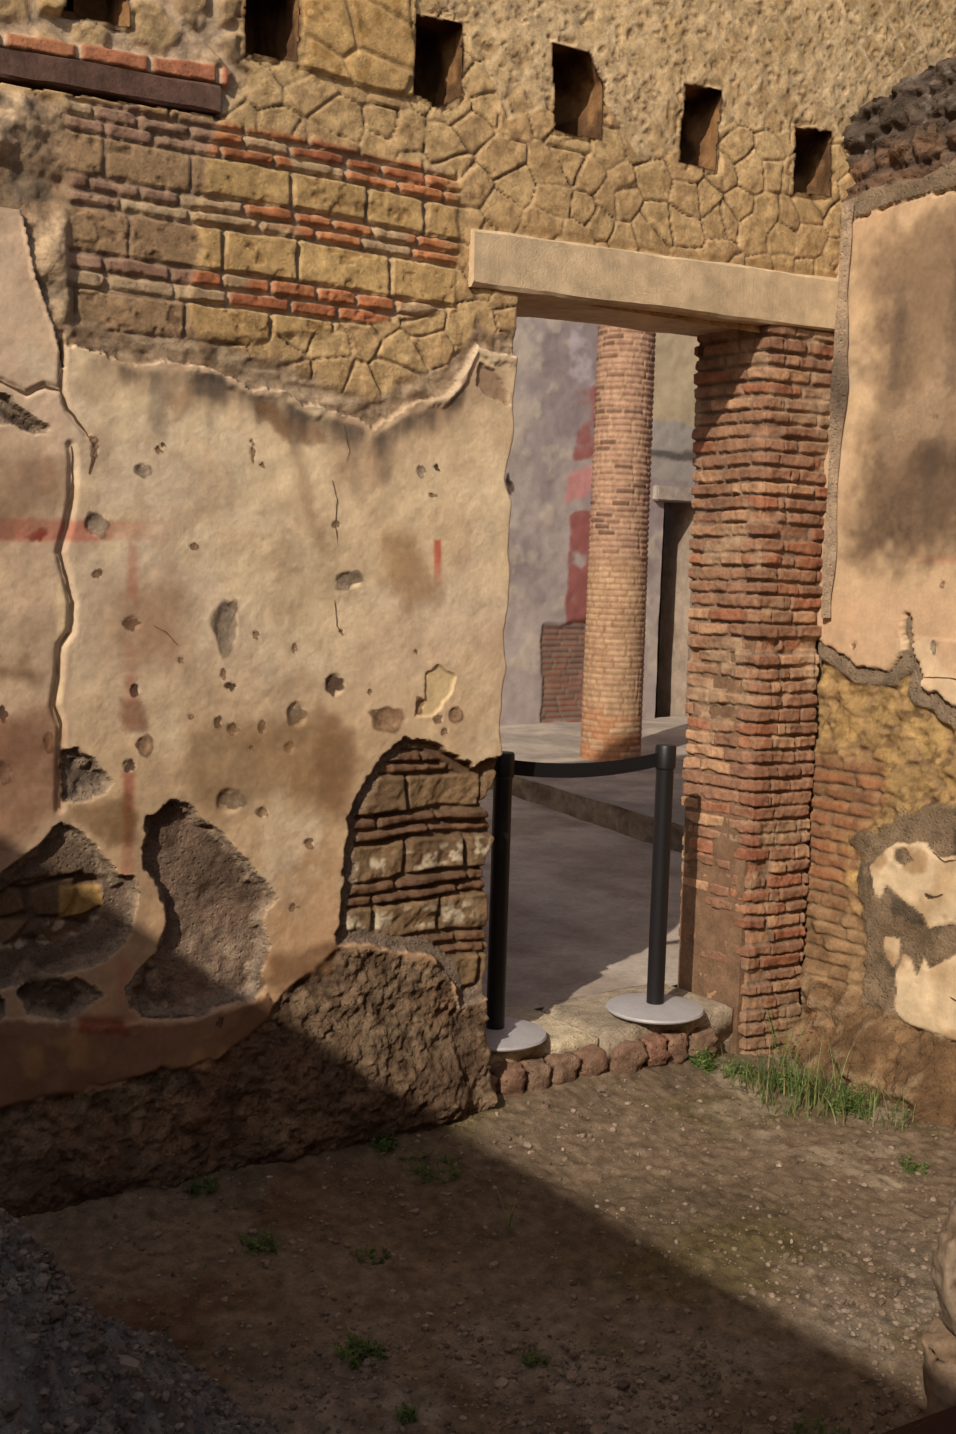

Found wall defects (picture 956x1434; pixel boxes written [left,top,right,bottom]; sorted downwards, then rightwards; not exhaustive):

spalling [0,392,50,435]
peeling [476,361,511,405]
crack [0,335,95,808]
spalling [211,600,237,691]
spalling [818,612,956,727]
spalling [61,734,152,803]
spalling [219,789,268,817]
spalling [335,664,499,1007]
spalling [0,798,299,1028]
peeling [870,841,956,928]
peeling [885,936,956,1040]